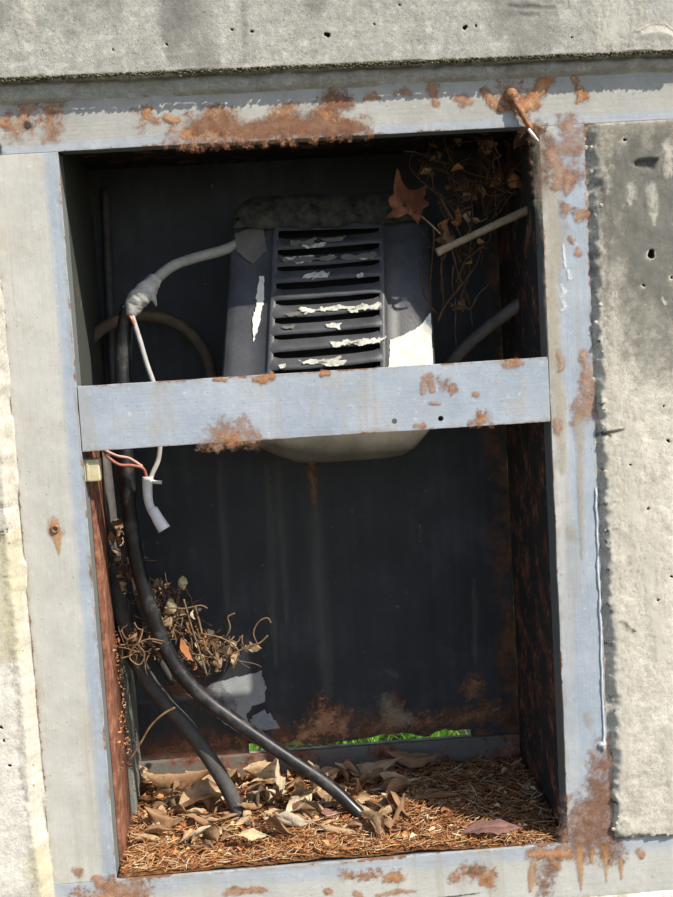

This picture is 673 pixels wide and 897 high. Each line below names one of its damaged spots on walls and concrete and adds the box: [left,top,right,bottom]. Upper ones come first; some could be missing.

rust [0,102,64,143]
rust [131,89,374,150]
rust [480,75,591,221]
rust [420,373,458,405]
rust [553,349,599,434]
rust [203,417,262,451]
rust [275,676,503,746]
rust [526,738,625,897]
rust [69,868,151,897]
rust [225,885,268,897]
rust [339,868,417,897]
rust [449,863,498,891]